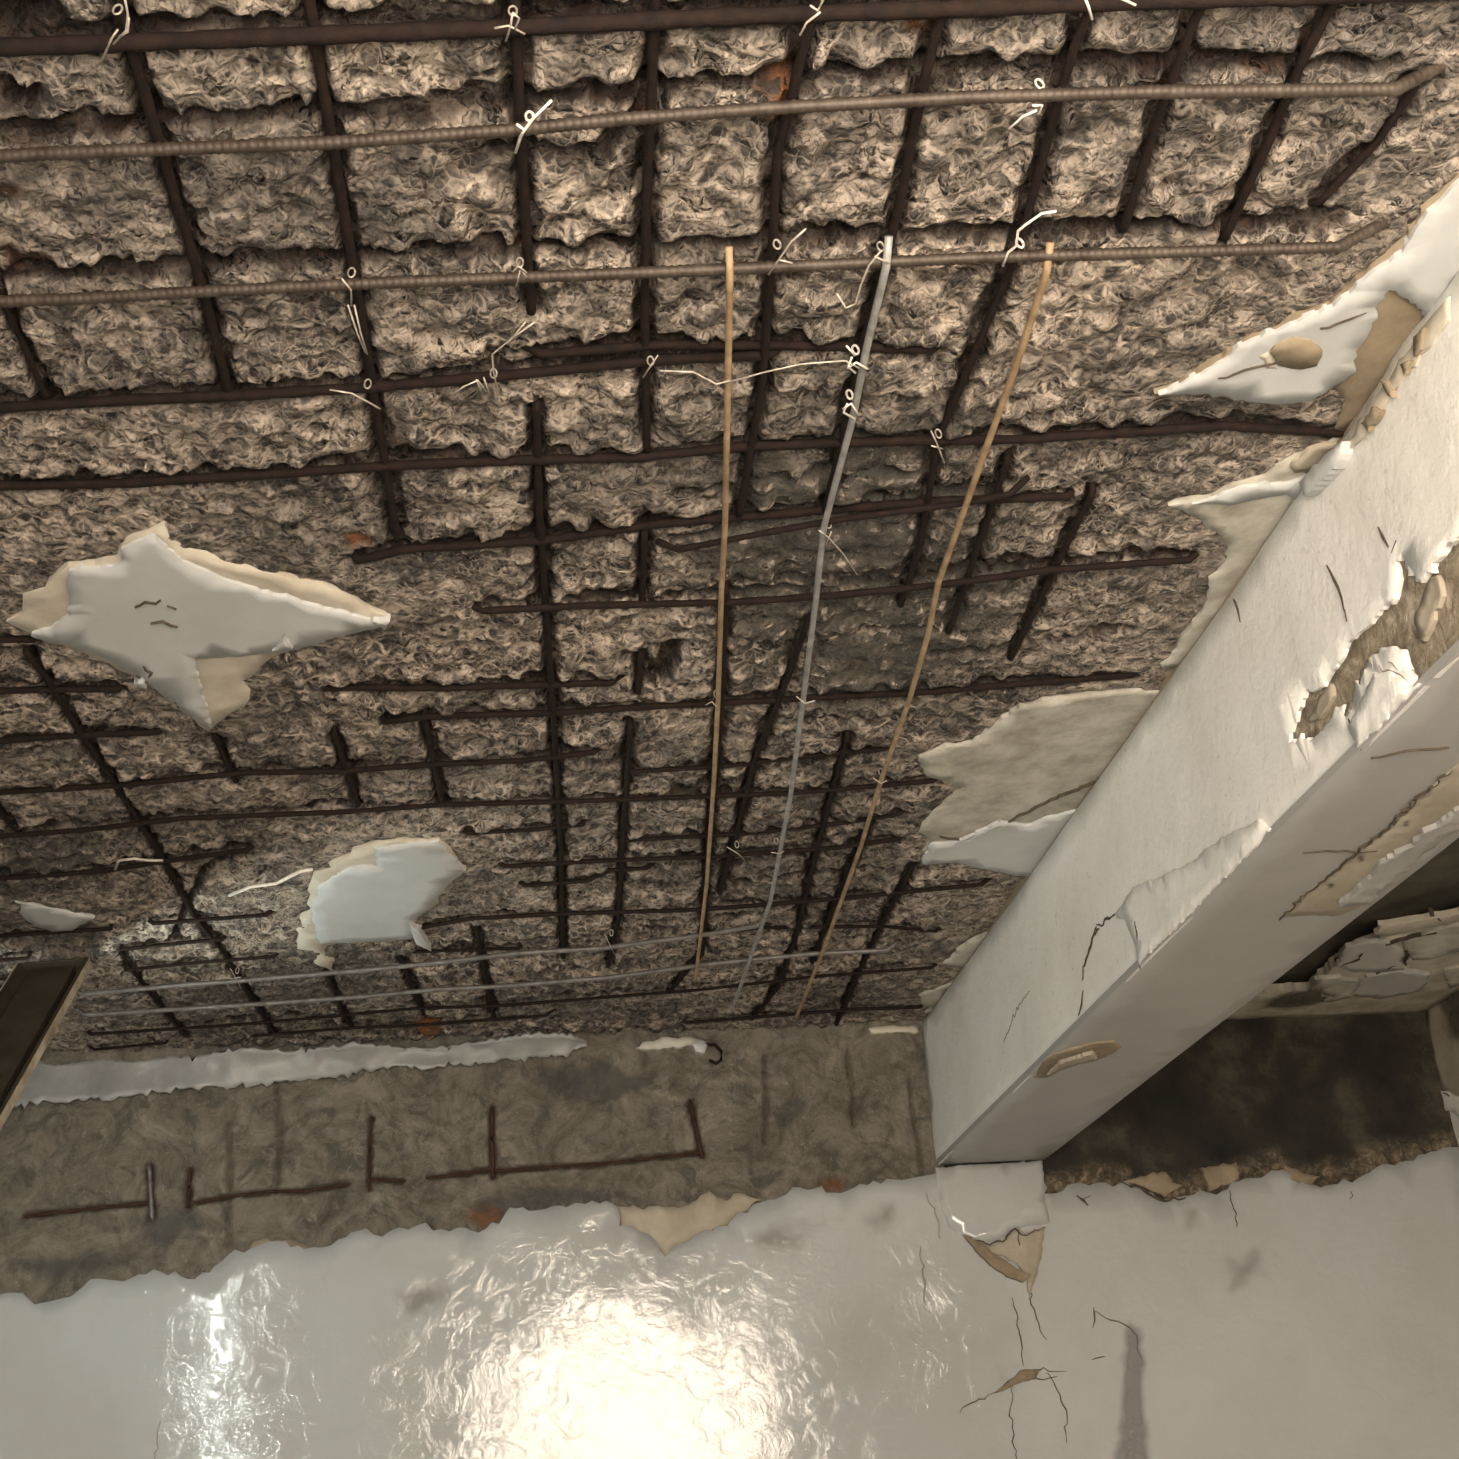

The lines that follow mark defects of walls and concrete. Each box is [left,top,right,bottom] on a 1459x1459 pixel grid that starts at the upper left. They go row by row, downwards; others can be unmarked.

spalling [0,0,1459,1012]
spalling [0,571,943,1304]
crack [1078,914,1141,1016]
spalling [1034,762,1459,1199]
peeling [962,1227,1045,1301]
crack [960,1293,1141,1459]
water stain [1119,1328,1147,1459]